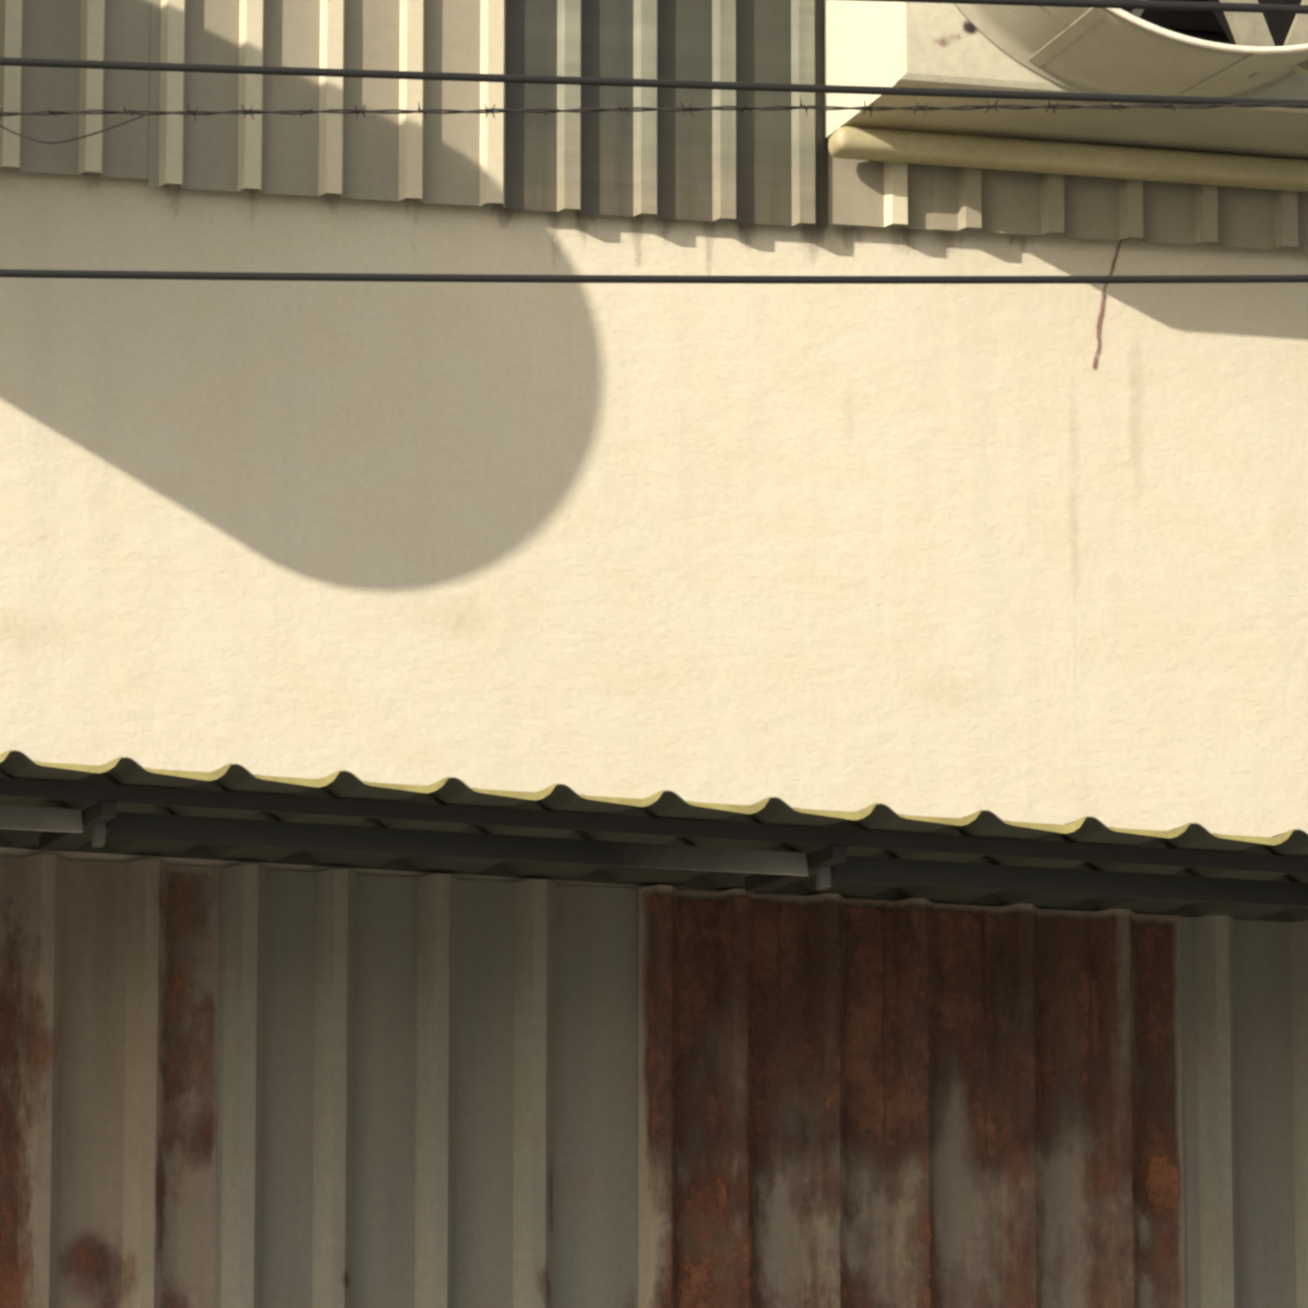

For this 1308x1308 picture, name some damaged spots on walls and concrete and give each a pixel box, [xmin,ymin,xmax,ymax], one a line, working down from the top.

corrosion [1093,243,1120,369]
corrosion [0,1090,29,1308]
corrosion [66,1237,113,1308]
corrosion [644,892,1180,1308]